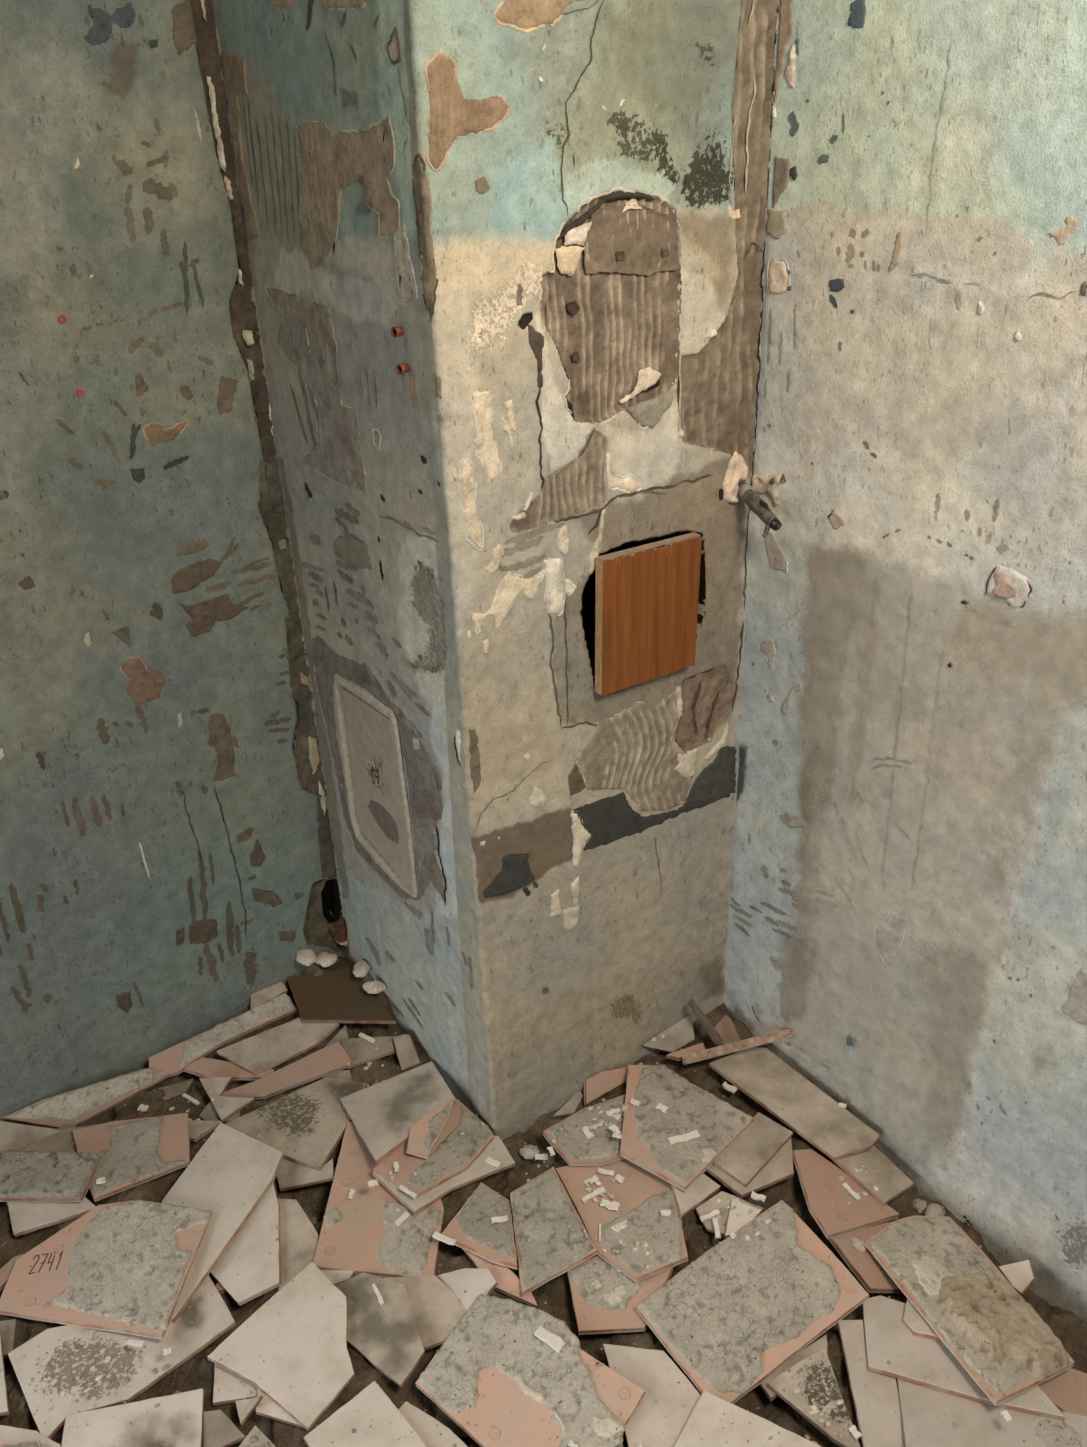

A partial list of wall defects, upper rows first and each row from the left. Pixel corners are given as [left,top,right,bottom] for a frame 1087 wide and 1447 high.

peeling [386,27,401,65]
peeling [295,49,511,323]
crack [561,0,604,211]
damp [607,105,735,209]
damp [696,42,715,66]
peeling [817,113,845,165]
peeling [829,228,903,314]
spalling [452,0,809,680]
damp [729,552,902,1022]